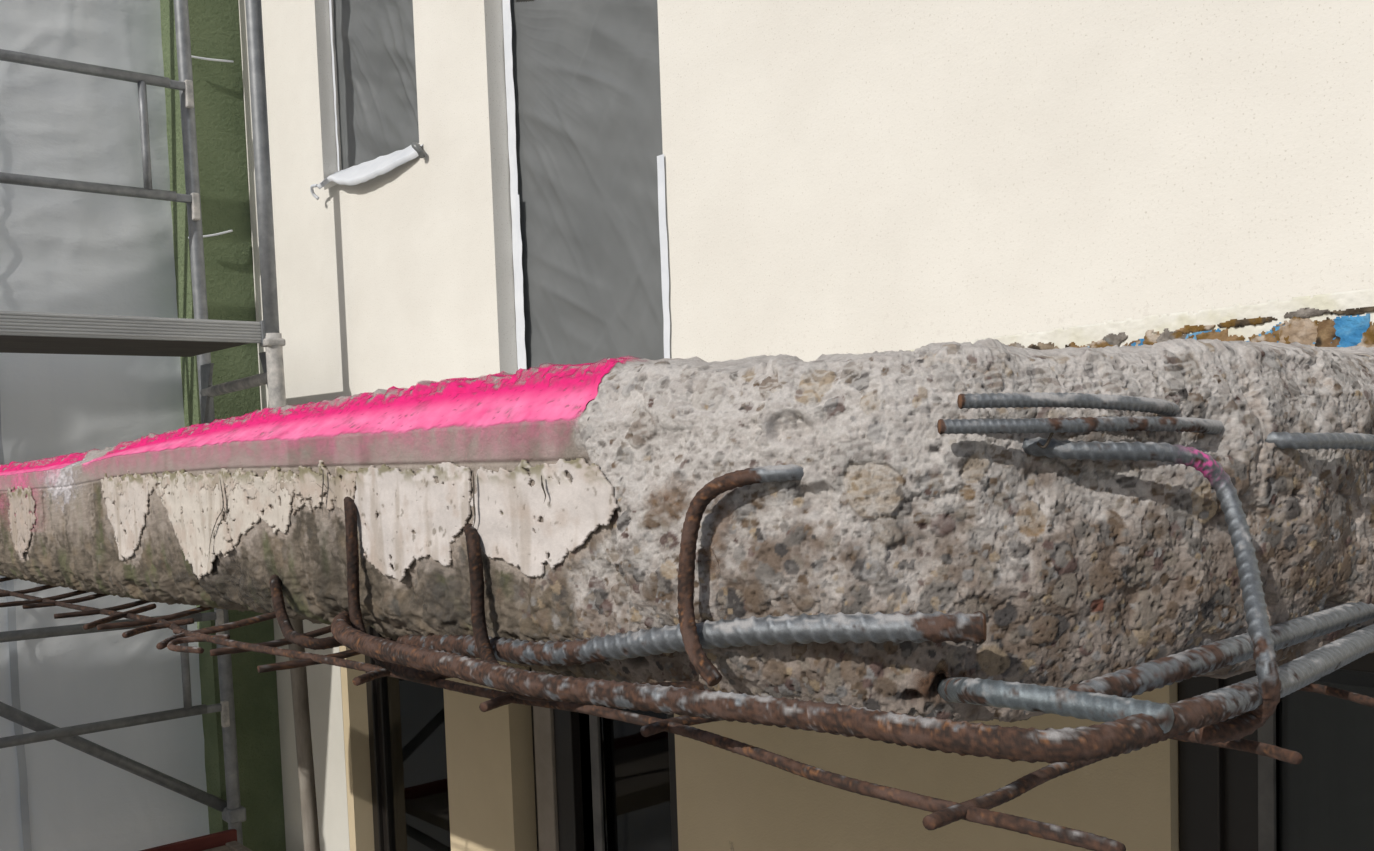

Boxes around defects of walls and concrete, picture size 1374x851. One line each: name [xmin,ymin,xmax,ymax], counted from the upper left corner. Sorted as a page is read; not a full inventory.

spalling [0,288,1374,723]